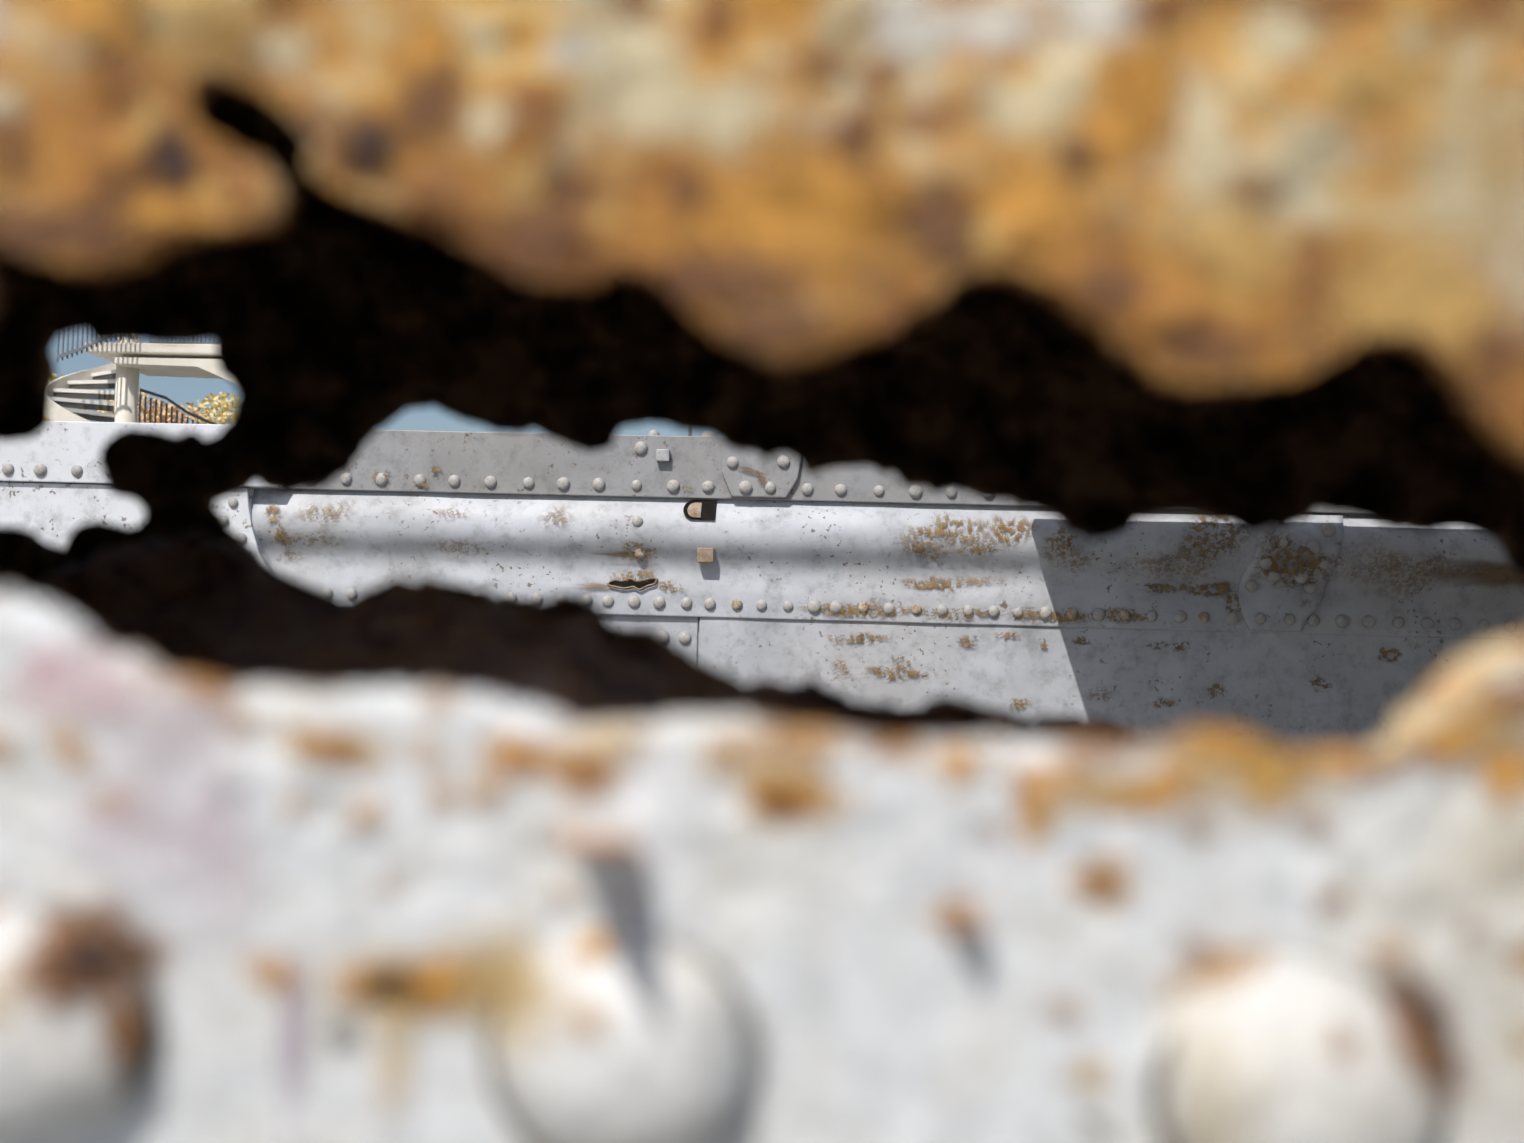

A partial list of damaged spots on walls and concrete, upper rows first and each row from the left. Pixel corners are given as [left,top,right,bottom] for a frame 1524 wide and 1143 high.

peeling [548,0,754,142]
peeling [872,0,1038,59]
peeling [1062,0,1141,36]
peeling [1253,16,1314,61]
peeling [1173,79,1339,191]
corrosion [0,0,1524,433]
corrosion [901,516,1085,590]
peeling [1362,637,1524,762]
corrosion [487,728,634,792]
corrosion [747,762,828,819]
corrosion [1015,732,1291,846]
corrosion [19,906,161,1105]